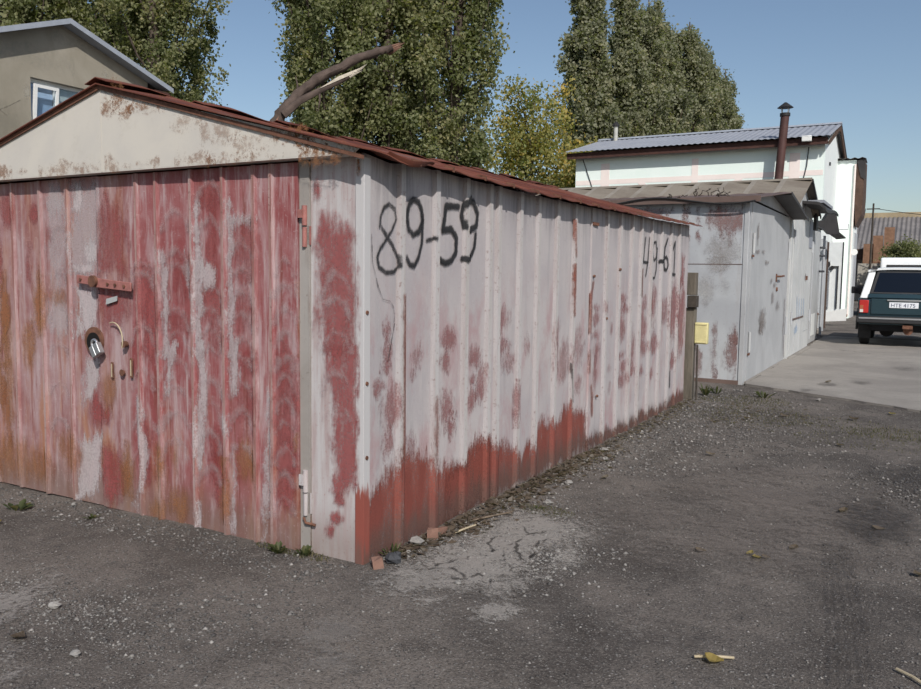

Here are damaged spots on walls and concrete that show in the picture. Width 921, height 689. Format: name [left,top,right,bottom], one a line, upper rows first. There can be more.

peeling [76,358,125,505]
peeling [49,183,179,394]
corrosion [101,80,165,121]
peeling [137,398,148,490]
peeling [184,181,257,503]
corrosion [270,124,360,172]
peeling [315,210,360,536]
corrosion [682,204,743,239]